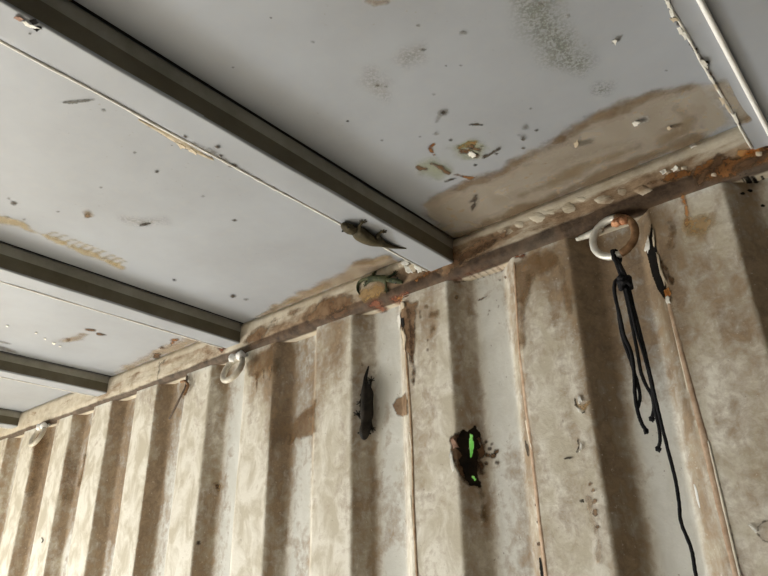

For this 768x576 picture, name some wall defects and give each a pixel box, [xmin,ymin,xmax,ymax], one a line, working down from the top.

peeling [665,0,740,125]
peeling [138,119,222,160]
damp [553,92,664,143]
damp [453,135,702,240]
rust [648,146,768,195]
rust [245,327,268,344]
rust [289,285,438,384]
peeling [449,438,459,473]